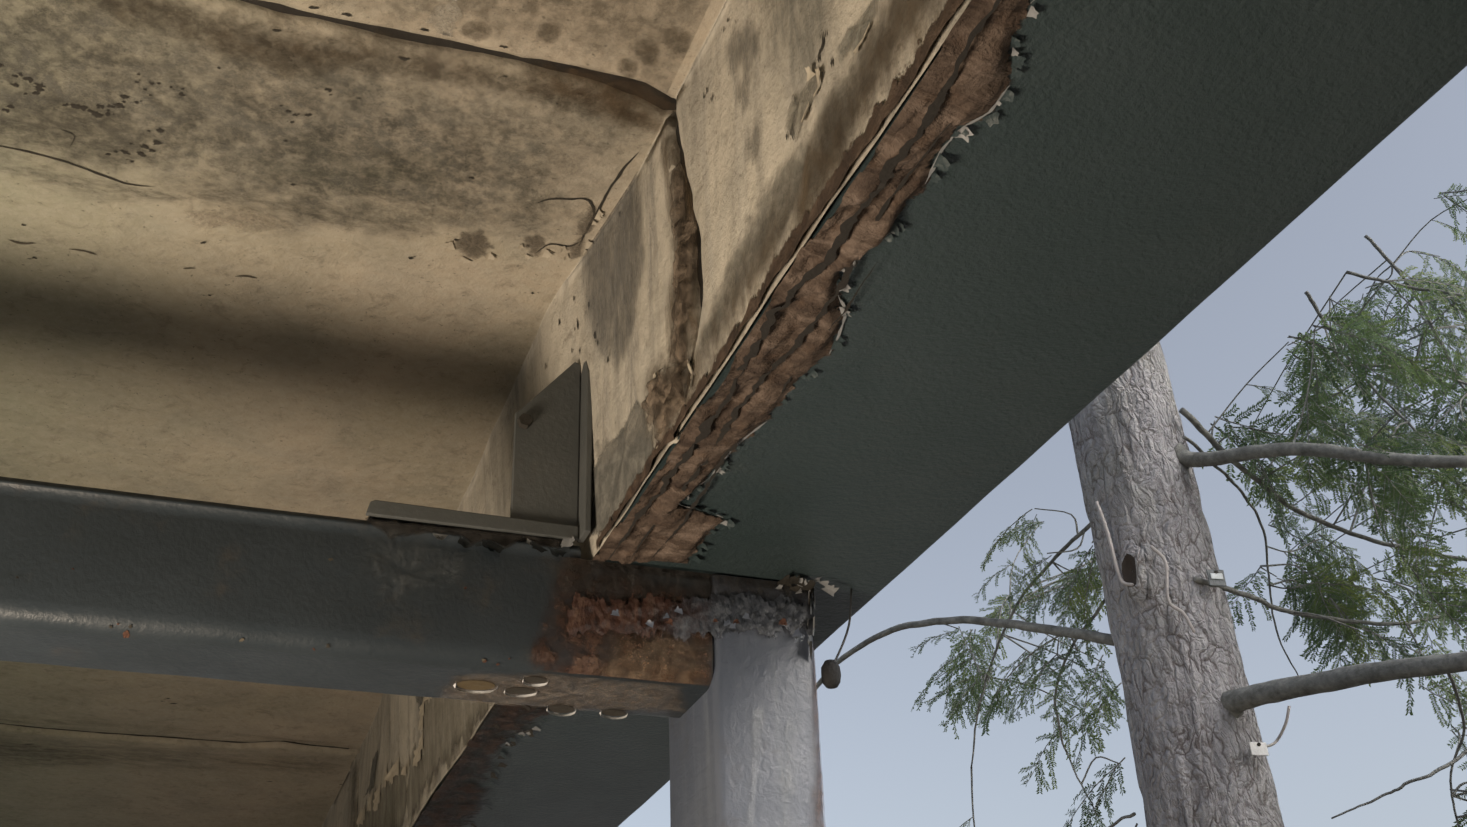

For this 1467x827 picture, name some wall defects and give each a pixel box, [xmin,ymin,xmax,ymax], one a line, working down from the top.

leakage [0,0,551,226]
crack [241,0,703,310]
leakage [702,0,925,341]
rust [592,0,1039,564]
peeling [785,1,875,140]
rust [416,676,676,827]
rust [816,772,825,827]